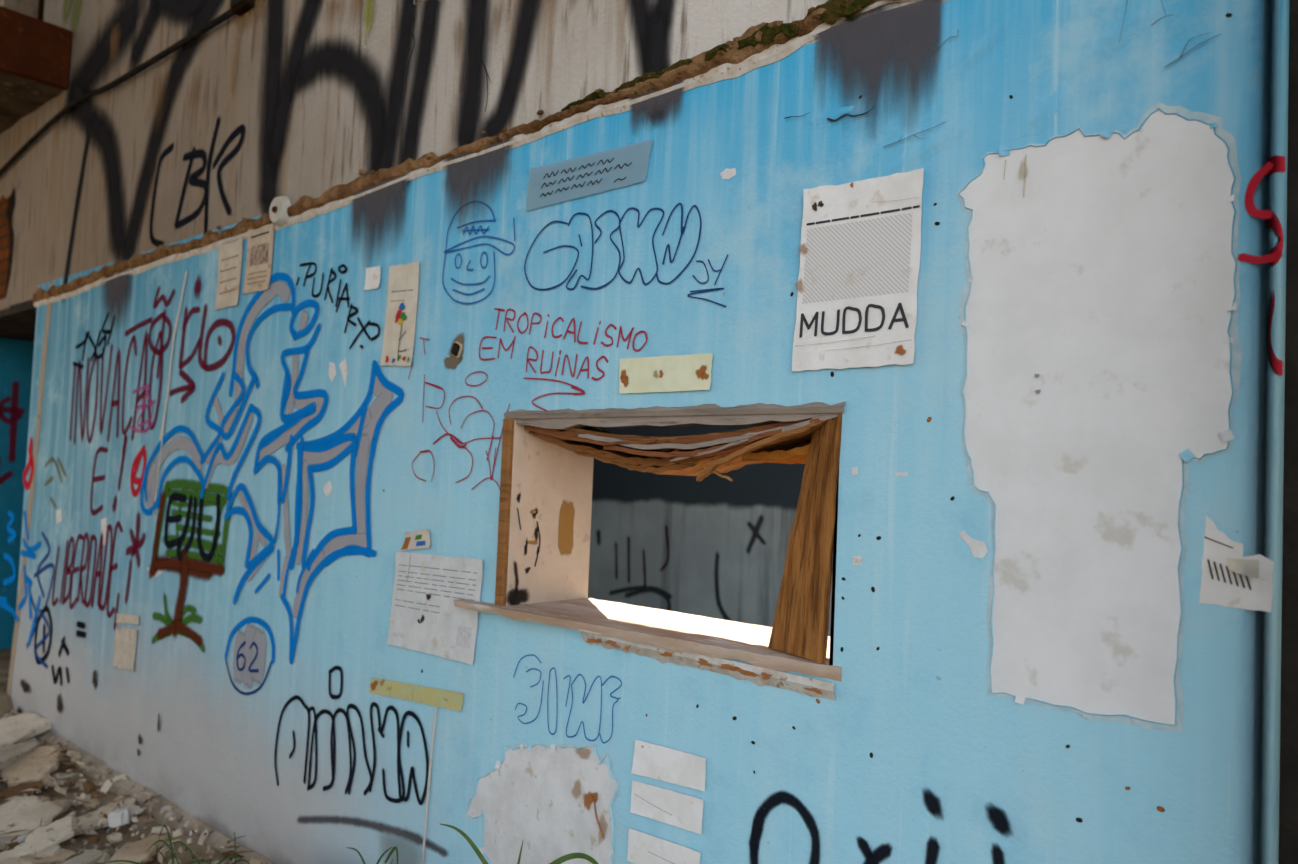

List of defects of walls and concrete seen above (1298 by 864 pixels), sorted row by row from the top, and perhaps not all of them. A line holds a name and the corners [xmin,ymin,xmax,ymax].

peeling [720,168,736,179]
flaking render [0,175,22,310]
peeling [956,102,1242,731]
peeling [465,742,620,864]